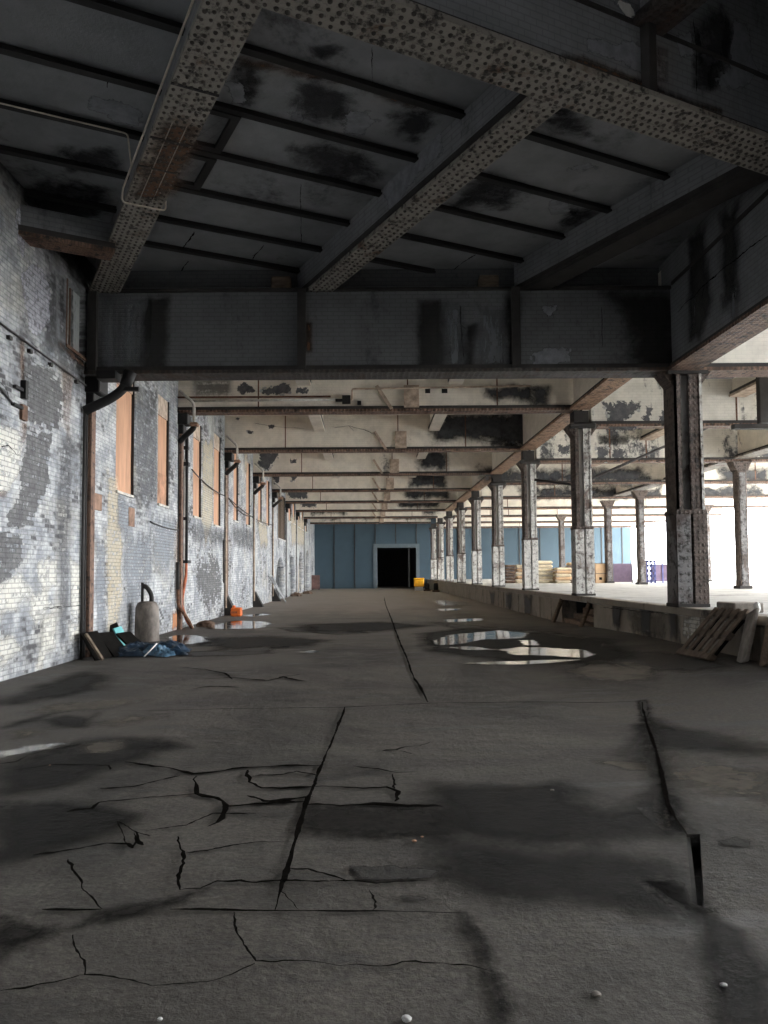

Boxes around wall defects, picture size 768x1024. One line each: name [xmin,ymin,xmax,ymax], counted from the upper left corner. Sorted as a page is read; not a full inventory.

water stain [232,62,262,104]
water stain [292,82,350,123]
water stain [389,111,433,142]
water stain [688,204,738,340]
water stain [417,298,512,365]
peeling [237,382,309,396]
peeling [601,400,664,432]
peeling [0,352,66,583]
water stain [421,622,731,671]
crack [1,742,443,910]
crack [0,912,489,991]